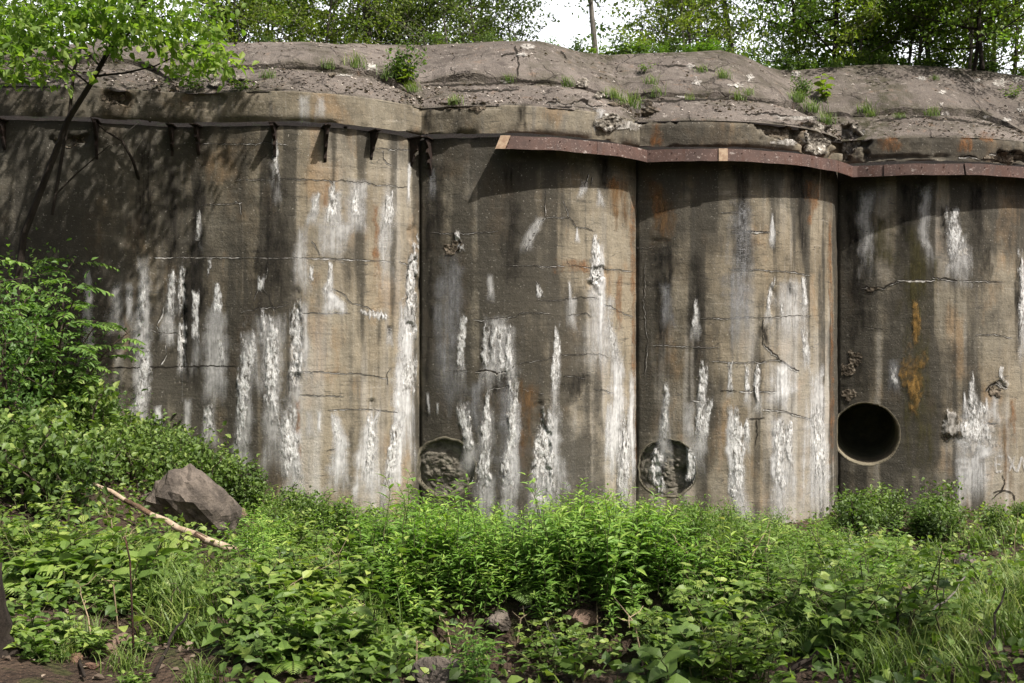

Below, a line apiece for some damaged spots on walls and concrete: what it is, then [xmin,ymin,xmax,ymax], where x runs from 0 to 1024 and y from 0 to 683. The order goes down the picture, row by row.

spalling [744,112,866,160]
leakage [126,139,225,442]
leakage [235,139,380,464]
leakage [308,166,444,495]
spalling [432,231,495,255]
leakage [456,316,561,526]
crack [473,189,811,441]
leakage [726,361,760,528]
leakage [772,373,829,520]
spalling [841,349,862,376]
crack [861,277,1002,292]
peeling [942,367,1009,493]